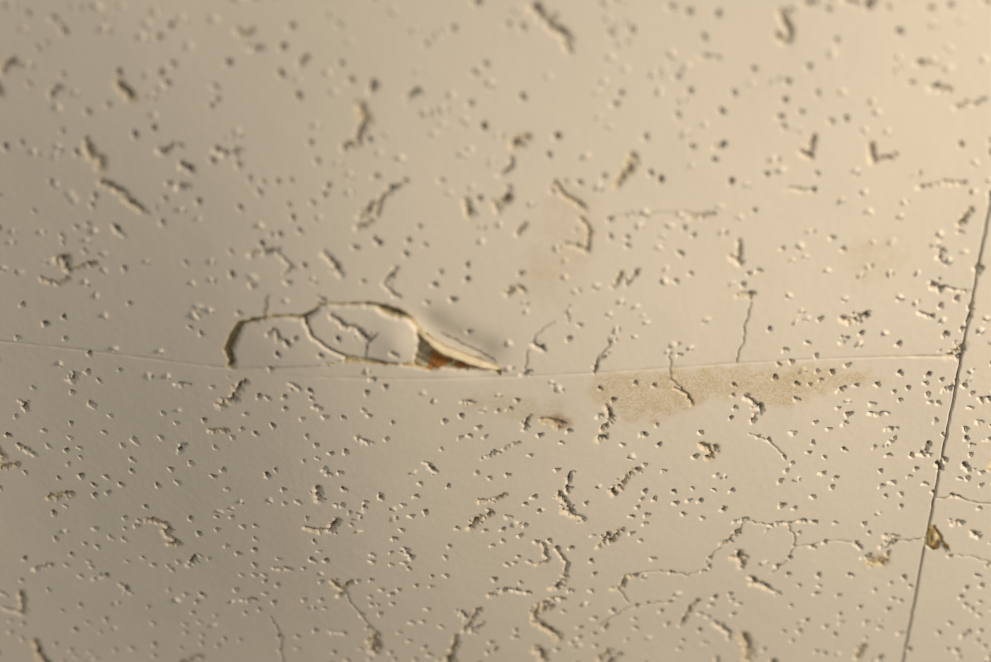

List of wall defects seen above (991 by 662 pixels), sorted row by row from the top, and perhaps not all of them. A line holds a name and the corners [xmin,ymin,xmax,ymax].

spalling [233,302,419,380]